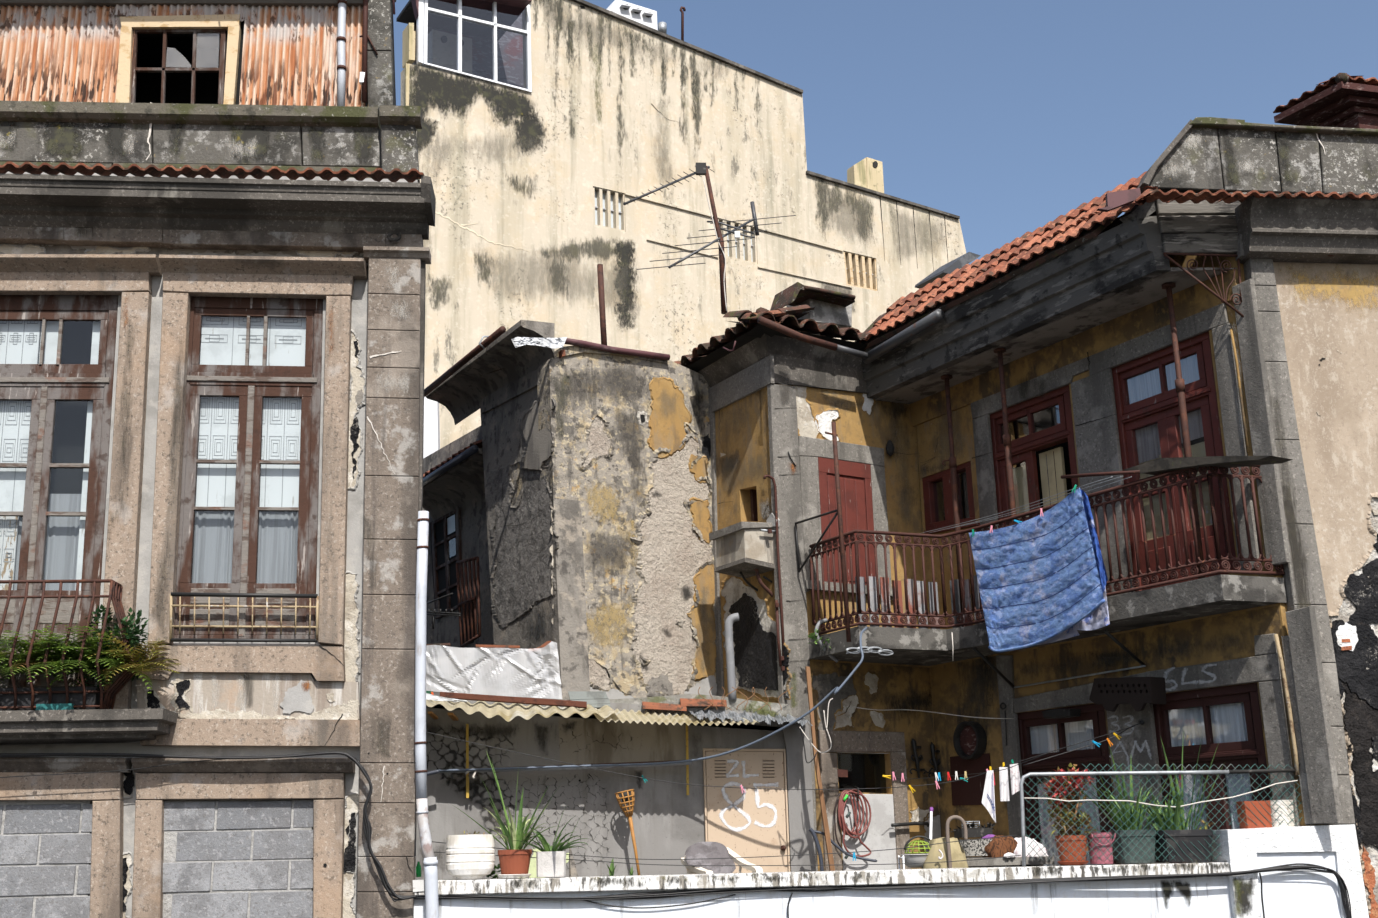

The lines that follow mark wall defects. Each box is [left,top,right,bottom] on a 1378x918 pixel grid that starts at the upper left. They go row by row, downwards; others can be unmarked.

leakage [409,64,546,152]
leakage [816,180,873,237]
leakage [428,274,448,308]
leakage [475,255,490,280]
leakage [543,238,637,328]
peeling [791,385,841,442]
flaking render [629,377,792,700]
flaking render [1328,492,1378,651]
flaking render [340,570,361,682]
flaking render [143,678,360,720]
flaking render [811,671,888,731]
peeling [1359,842,1378,918]